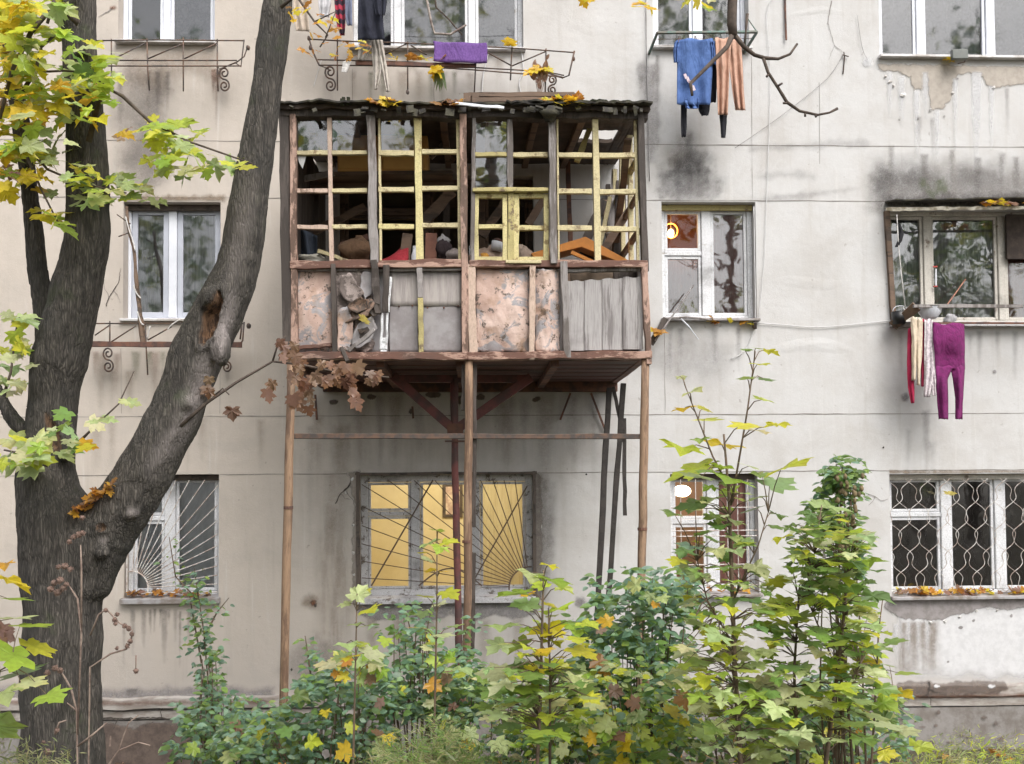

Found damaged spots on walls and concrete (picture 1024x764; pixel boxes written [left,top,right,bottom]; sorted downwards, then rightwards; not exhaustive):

peeling [878,64,1024,131]
water stain [886,178,1024,206]